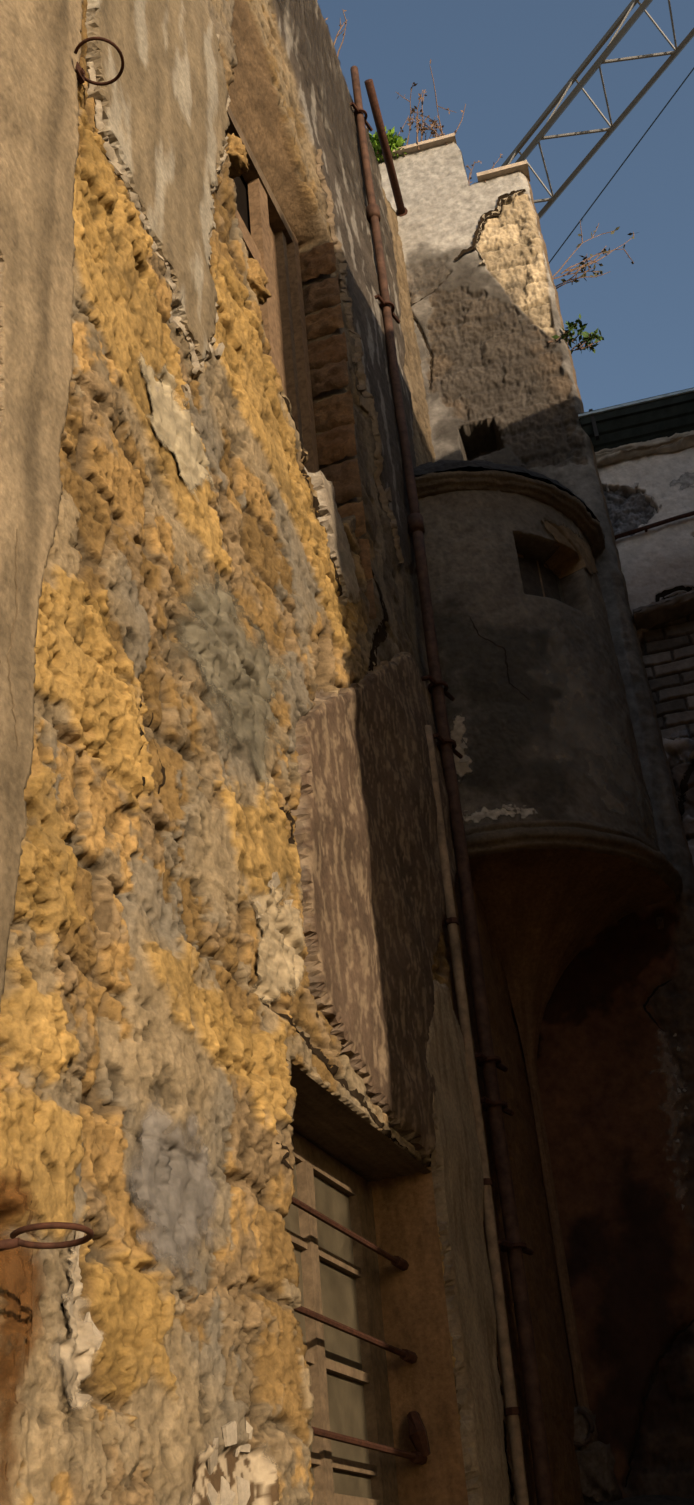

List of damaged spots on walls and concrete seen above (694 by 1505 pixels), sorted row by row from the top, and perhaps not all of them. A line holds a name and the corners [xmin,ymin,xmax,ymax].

spalling [474,191,523,266]
crack [655,585,694,602]
crack [0,529,18,746]
water stain [522,908,676,1062]
peeling [189,1421,280,1505]